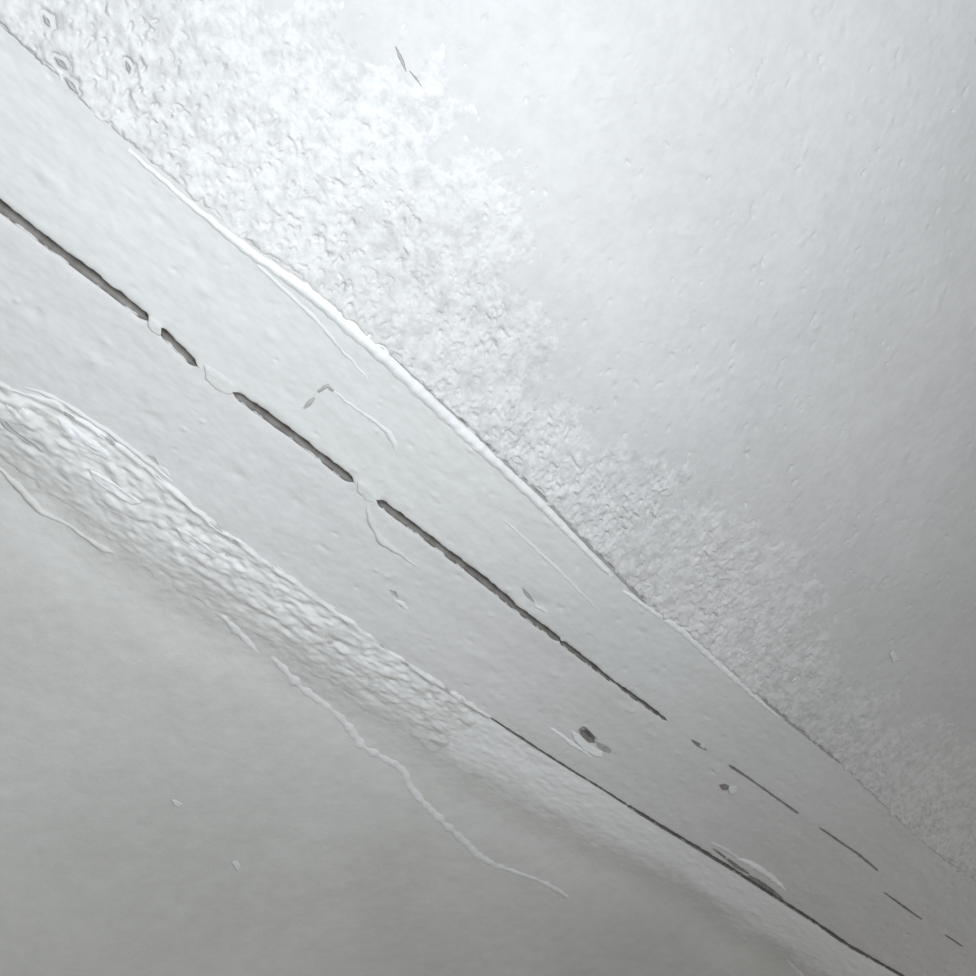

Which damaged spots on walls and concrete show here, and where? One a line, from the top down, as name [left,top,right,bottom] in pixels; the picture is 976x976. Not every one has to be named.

crack [0,199,197,366]
crack [60,410,116,446]
crack [233,392,353,482]
crack [383,348,646,603]
crack [378,500,667,721]
crack [215,611,569,899]
peeling [550,727,612,758]
crack [765,701,838,762]
crack [491,718,904,976]
peeling [710,842,787,899]
crack [819,827,922,920]